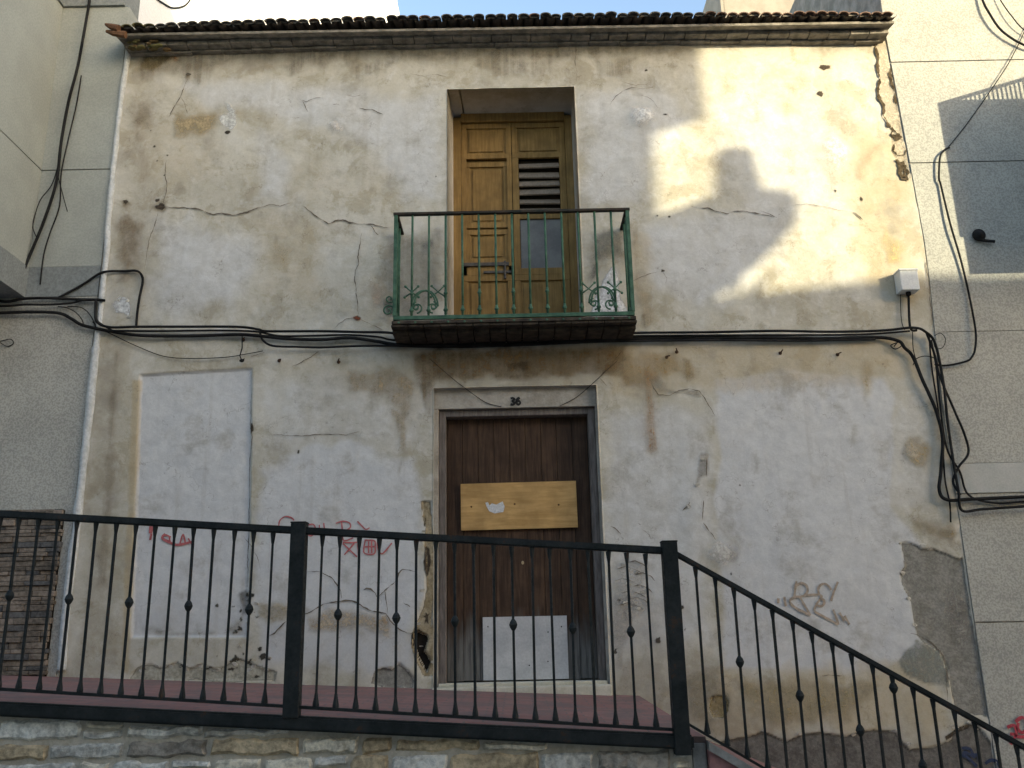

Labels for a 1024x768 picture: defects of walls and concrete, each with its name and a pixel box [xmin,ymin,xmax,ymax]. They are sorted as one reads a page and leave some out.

flaking render [875,41,910,180]
crack [146,163,387,330]
crack [692,204,862,219]
spalling [131,591,277,683]
crack [271,569,415,635]
spalling [371,501,434,688]
spalling [721,542,994,768]